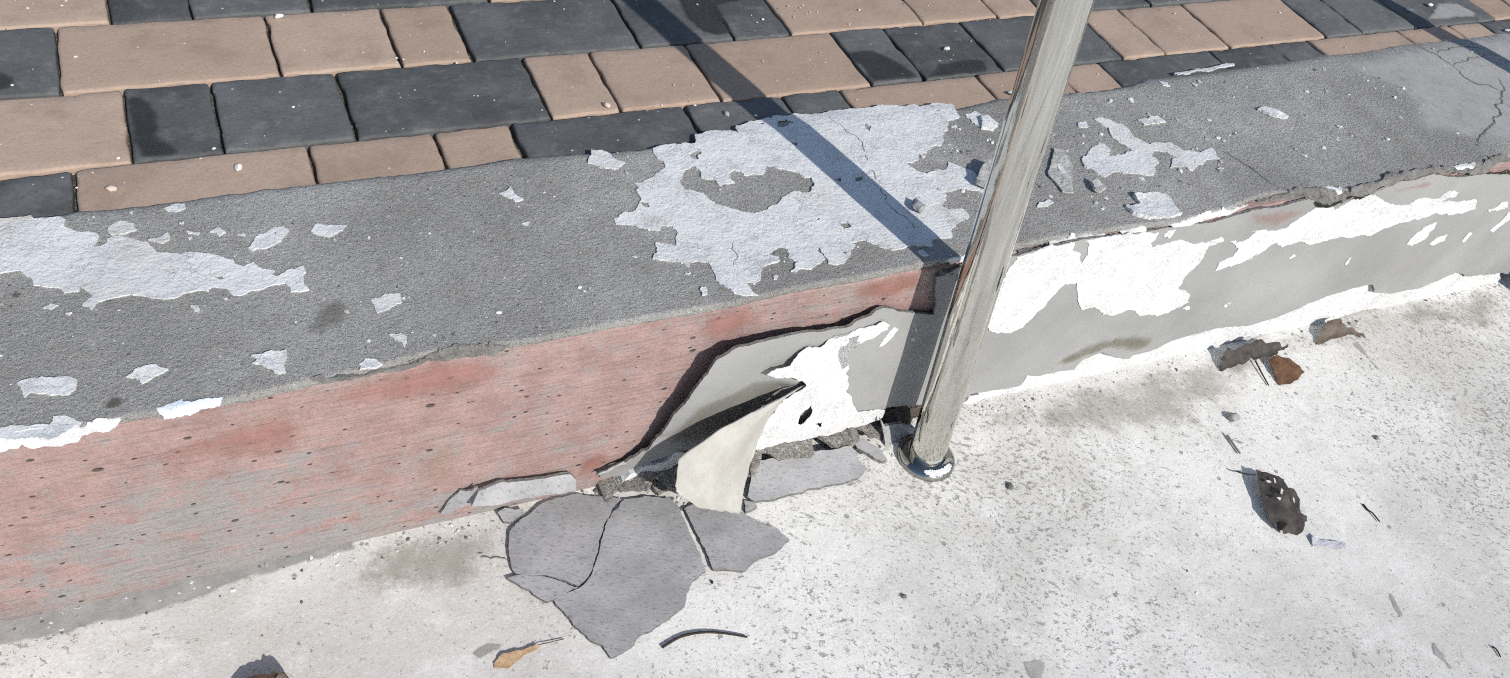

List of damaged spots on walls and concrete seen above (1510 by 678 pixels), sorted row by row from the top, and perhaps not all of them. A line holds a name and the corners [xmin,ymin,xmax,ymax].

crack [1422,46,1510,174]
peeling [0,203,309,316]
peeling [588,103,999,296]
peeling [988,98,1510,334]
crack [1314,186,1384,208]
peeling [17,376,78,398]
peeling [0,399,121,452]
peeling [126,364,169,384]
peeling [156,397,223,420]
peeling [251,349,287,375]
spalling [439,321,921,659]
peeling [0,542,353,644]